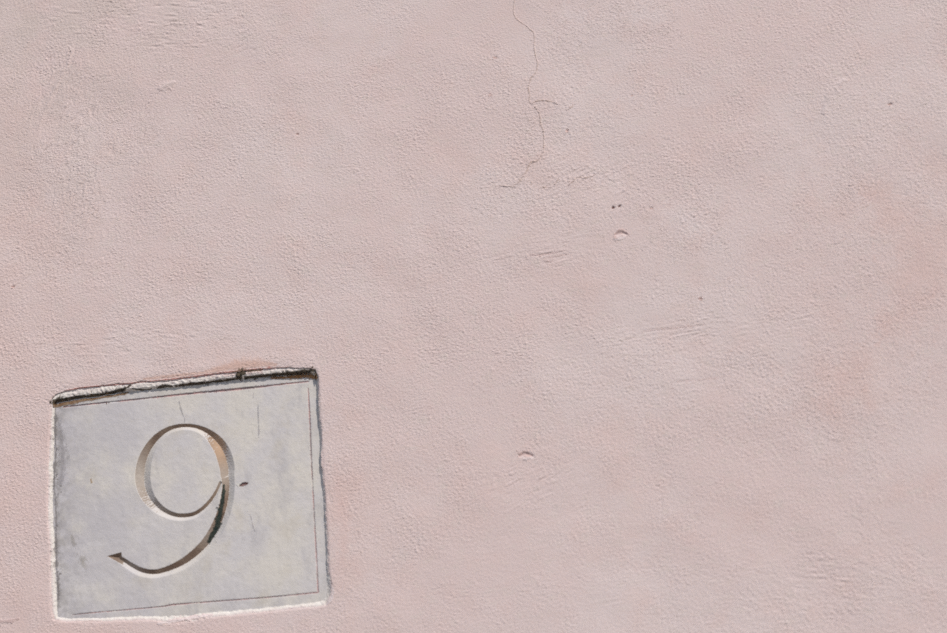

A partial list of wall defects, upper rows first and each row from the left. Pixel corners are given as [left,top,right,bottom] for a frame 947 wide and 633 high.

crack [499,0,597,190]